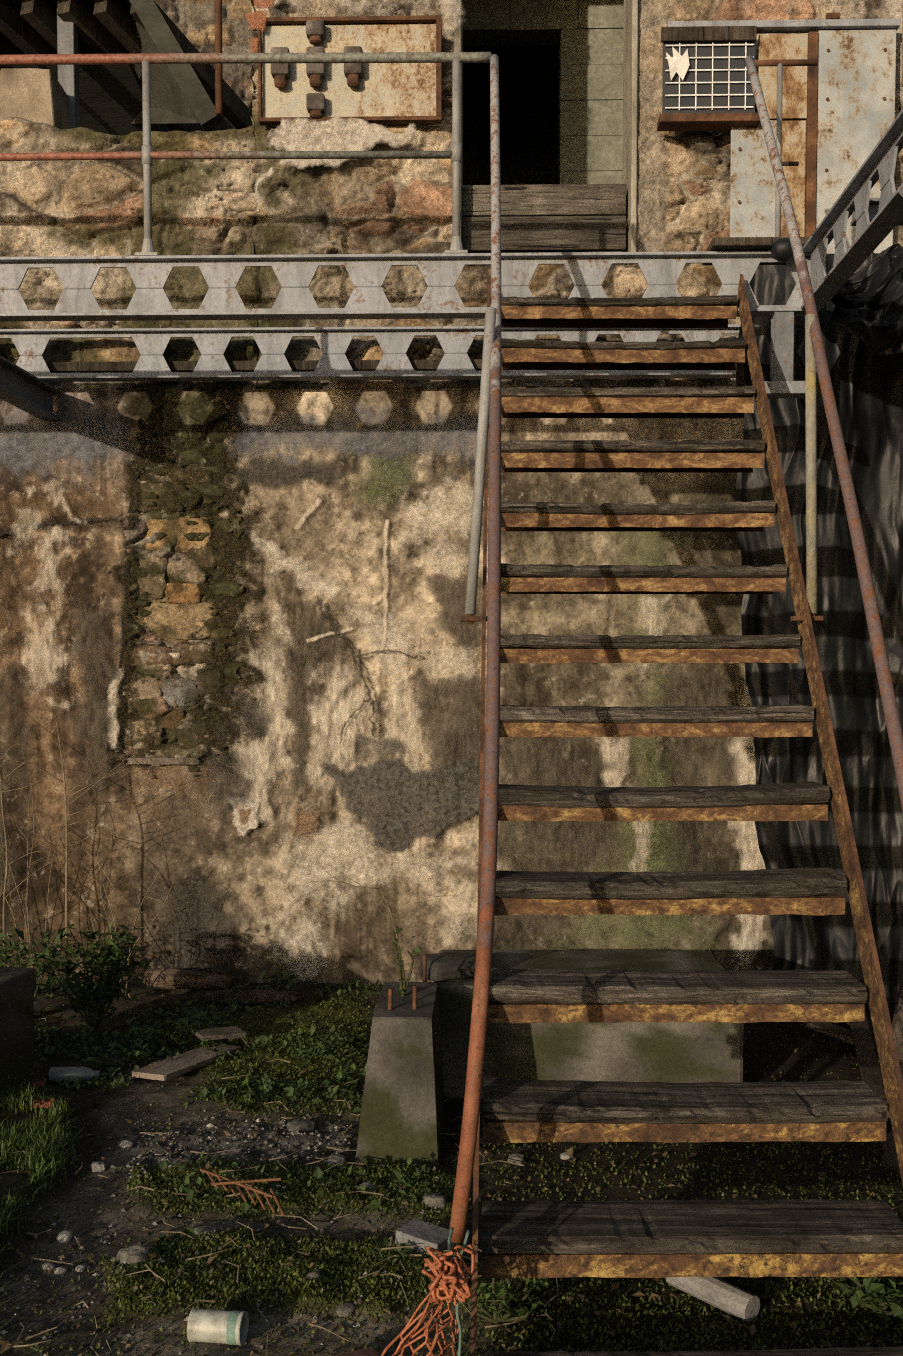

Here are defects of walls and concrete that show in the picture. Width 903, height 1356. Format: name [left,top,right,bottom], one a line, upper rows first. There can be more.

rust [758,34,808,237]
leakage [0,410,122,467]
peeling [23,621,67,683]
leakage [73,605,115,797]
spalling [106,381,245,779]